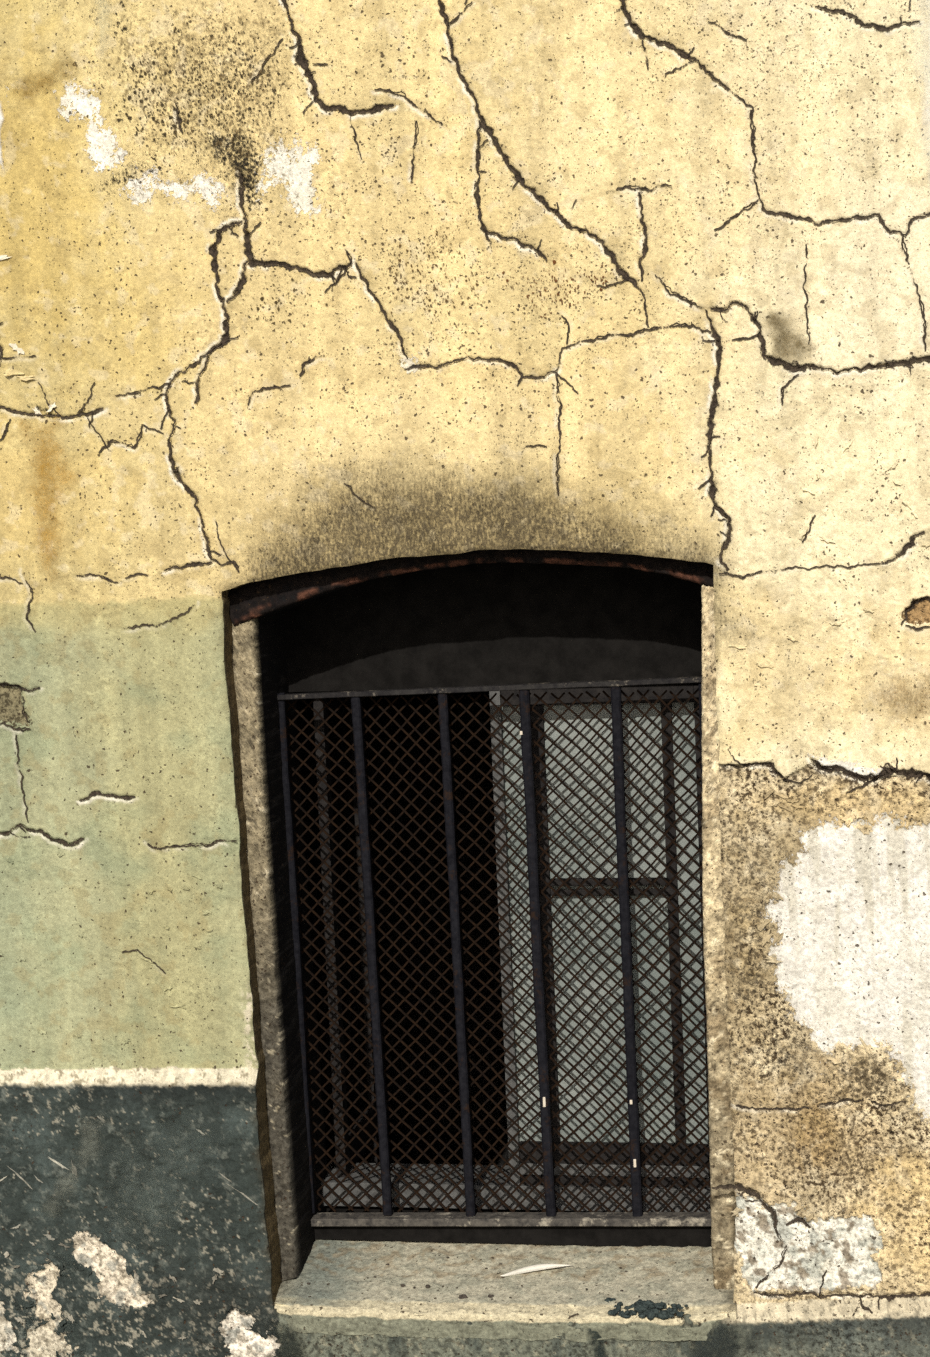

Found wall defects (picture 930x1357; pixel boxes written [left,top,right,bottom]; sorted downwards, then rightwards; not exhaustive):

peeling [55,78,228,212]
leakage [102,8,286,215]
peeling [245,131,327,219]
crack [0,0,930,583]
crack [901,596,930,631]
crack [0,682,84,847]
crack [79,791,135,801]
crack [723,749,930,793]
flaking render [758,789,930,1123]
peeling [0,1231,202,1357]
peeling [205,1305,281,1357]
flaking render [730,1193,892,1300]